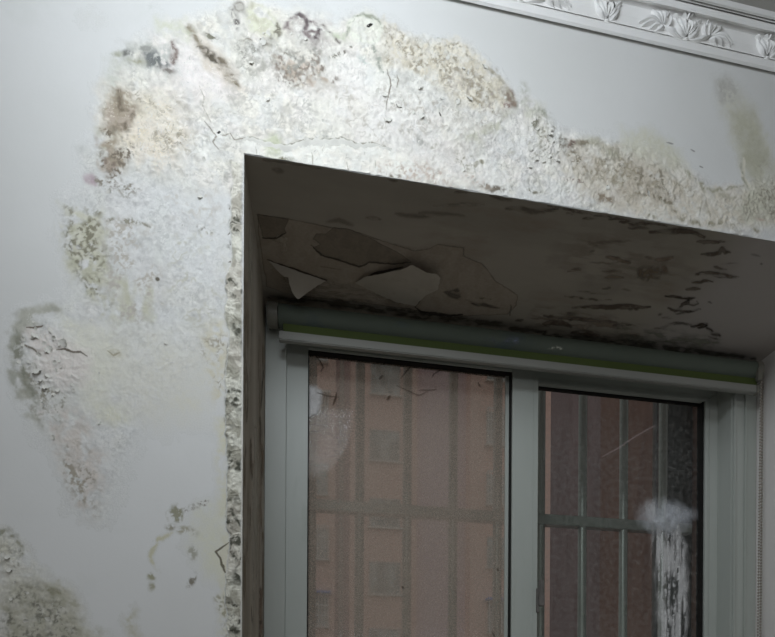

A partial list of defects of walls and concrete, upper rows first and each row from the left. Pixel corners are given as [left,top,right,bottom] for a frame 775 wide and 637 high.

water stain [70,0,775,256]
water stain [0,197,169,530]
spalling [191,130,422,637]
peeling [257,214,518,316]
water stain [268,266,756,360]
water stain [0,522,146,637]
water stain [146,494,226,593]